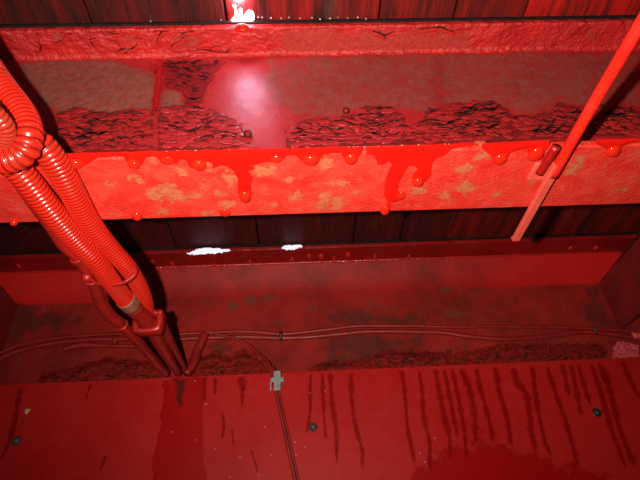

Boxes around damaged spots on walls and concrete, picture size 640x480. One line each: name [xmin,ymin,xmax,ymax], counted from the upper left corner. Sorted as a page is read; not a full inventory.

crack [35,30,248,56]
peeling [21,59,257,164]
damp [66,140,550,208]
peeling [315,179,350,212]
peeling [283,53,614,202]
damp [596,138,640,151]
damp [152,377,216,480]
damp [321,374,338,460]
damp [411,365,602,480]